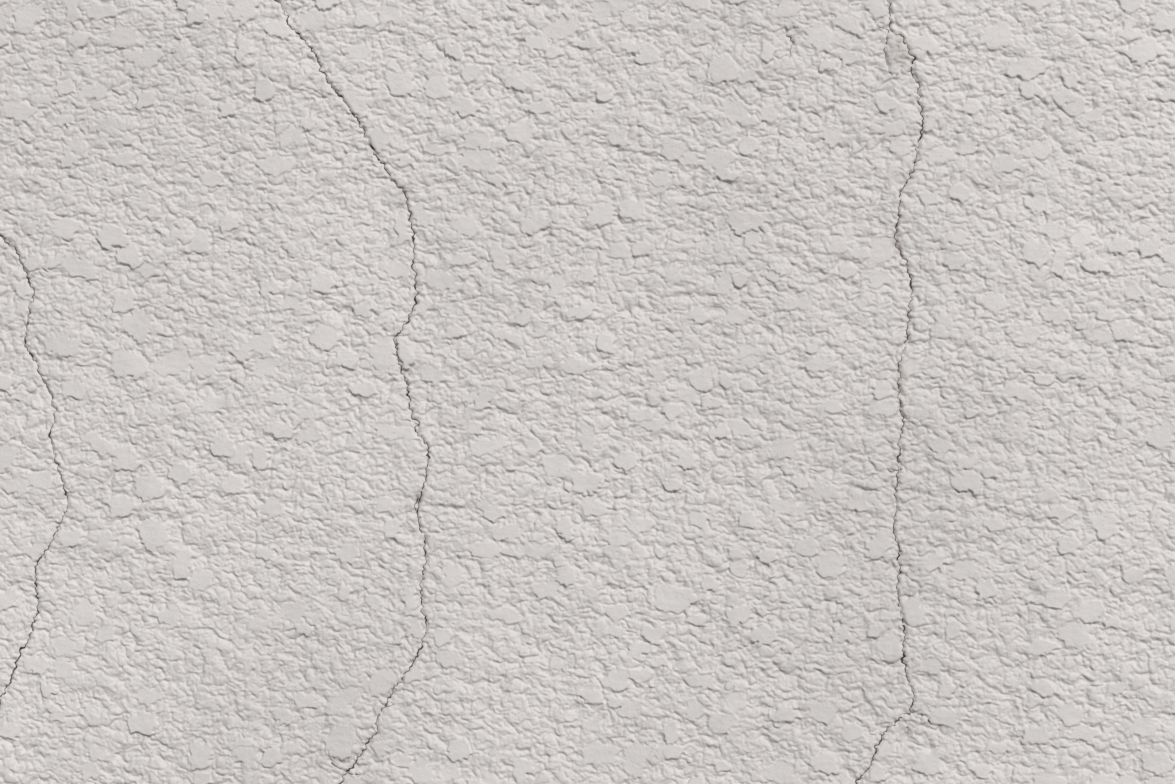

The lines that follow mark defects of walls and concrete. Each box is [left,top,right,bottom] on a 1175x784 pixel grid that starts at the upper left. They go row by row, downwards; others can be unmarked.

crack [0,235,68,705]
crack [274,0,430,784]
crack [855,0,932,784]